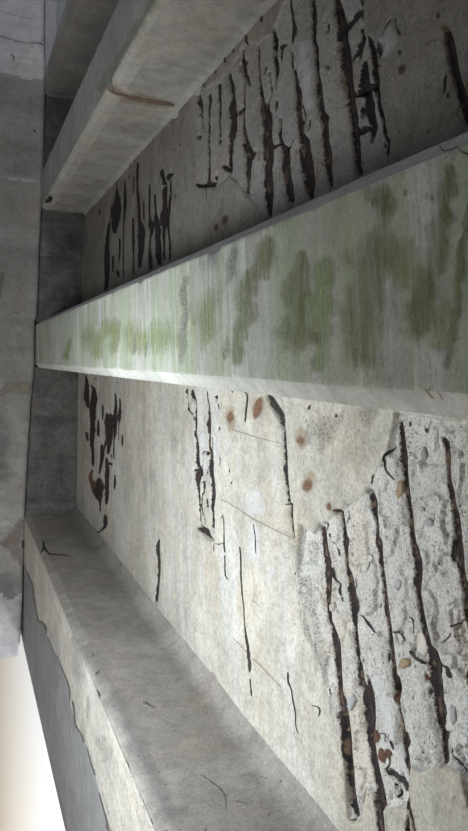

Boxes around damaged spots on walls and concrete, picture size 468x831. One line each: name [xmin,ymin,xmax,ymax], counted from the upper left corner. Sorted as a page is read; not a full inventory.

corrosion [105,84,174,106]
crack [273,0,297,108]
spalling [195,0,390,220]
corrosion [253,398,262,417]
crack [268,395,295,547]
crack [371,446,397,484]
peeling [23,517,155,831]
crack [154,539,162,603]
crack [215,515,256,696]
spalling [296,411,468,831]
crack [323,511,467,693]
crack [386,770,409,798]